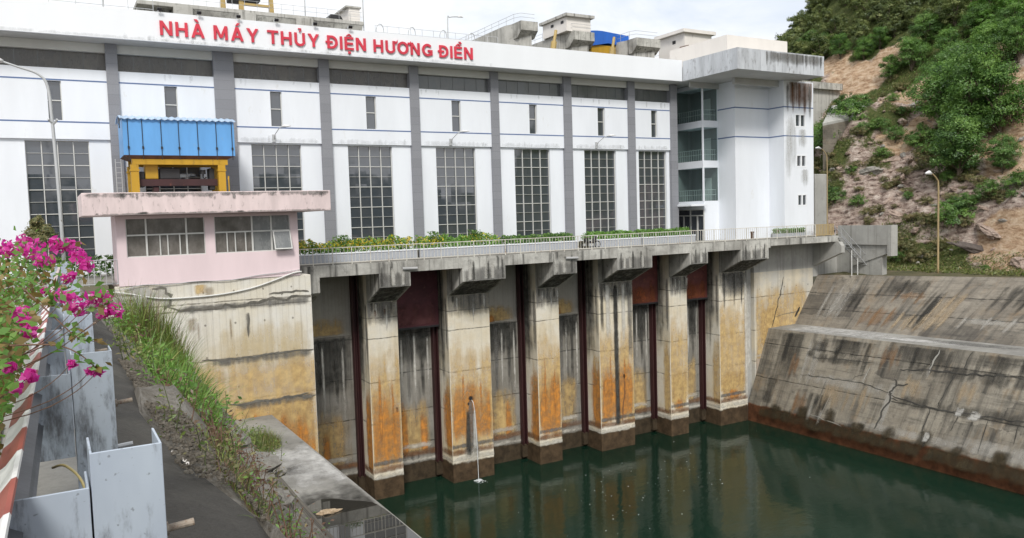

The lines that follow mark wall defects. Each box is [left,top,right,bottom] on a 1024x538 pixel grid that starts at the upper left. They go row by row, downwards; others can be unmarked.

crack [772,277,800,326]
rust [366,382,428,468]
rust [444,381,514,447]
rust [532,373,575,440]
leakage [198,245,1009,484]
rust [593,361,645,426]
crack [800,352,1024,451]